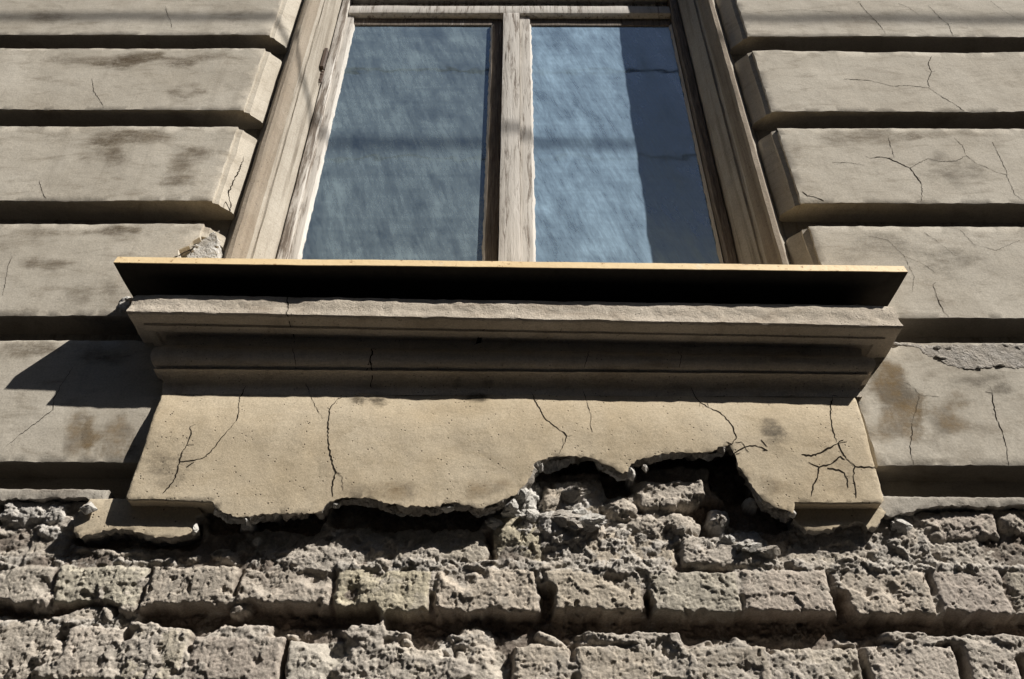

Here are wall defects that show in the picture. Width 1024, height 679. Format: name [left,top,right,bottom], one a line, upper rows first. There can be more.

flaking render [186,232,223,258]
flaking render [893,342,1024,370]
crack [163,386,246,493]
crack [307,387,343,496]
flaking render [534,458,575,478]
crack [532,392,593,451]
flaking render [596,463,649,481]
crack [678,352,768,456]
crack [801,395,875,498]
crack [988,387,1009,466]
flaking render [213,508,280,526]
flaking render [324,488,530,518]